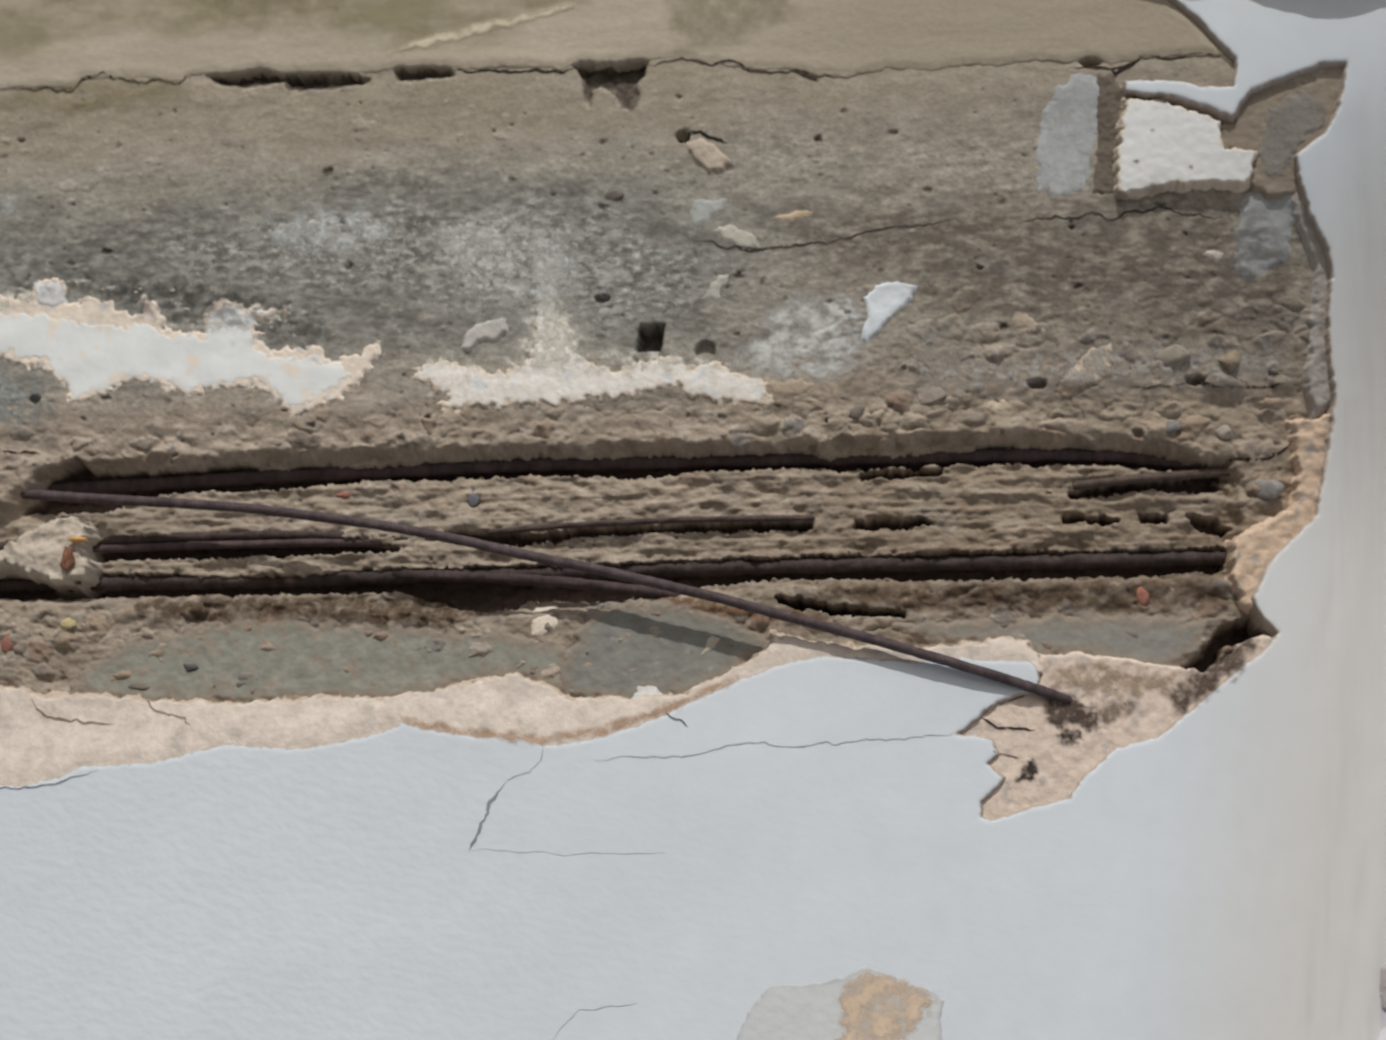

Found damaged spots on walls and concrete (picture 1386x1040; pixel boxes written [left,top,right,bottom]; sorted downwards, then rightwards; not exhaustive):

crack [11,71,203,93]
crack [455,67,577,75]
crack [646,57,849,81]
crack [681,218,957,253]
damp [160,197,730,373]
spalling [0,66,1341,819]
corrosion [60,537,88,571]
corrosion [135,595,480,627]
corrosion [833,580,1219,613]
corrosion [421,684,721,743]
crack [469,744,649,856]
peeling [736,966,945,1040]